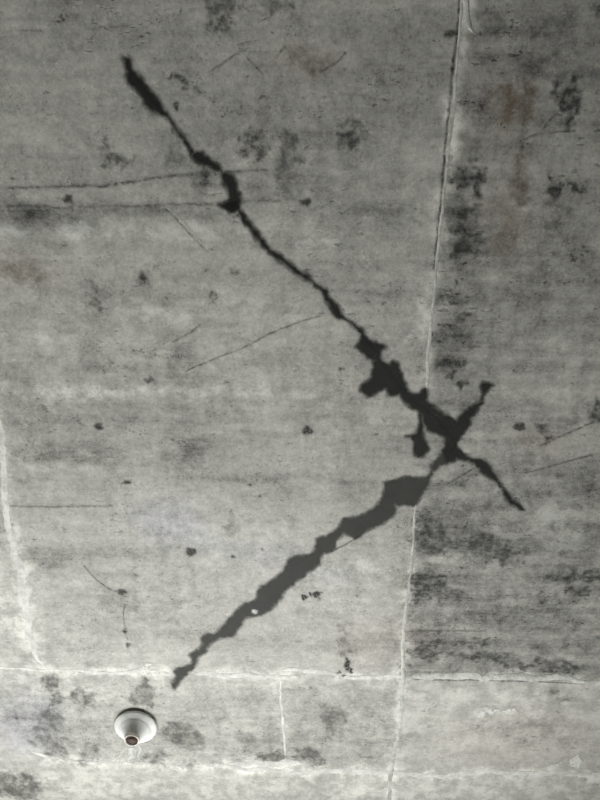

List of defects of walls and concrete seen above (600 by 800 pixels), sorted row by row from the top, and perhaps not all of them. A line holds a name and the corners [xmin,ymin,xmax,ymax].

crack [450,9,460,92]
leakage [551,76,580,125]
leakage [547,177,583,198]
leakage [123,57,524,689]
leakage [547,570,600,596]
leakage [519,657,579,673]